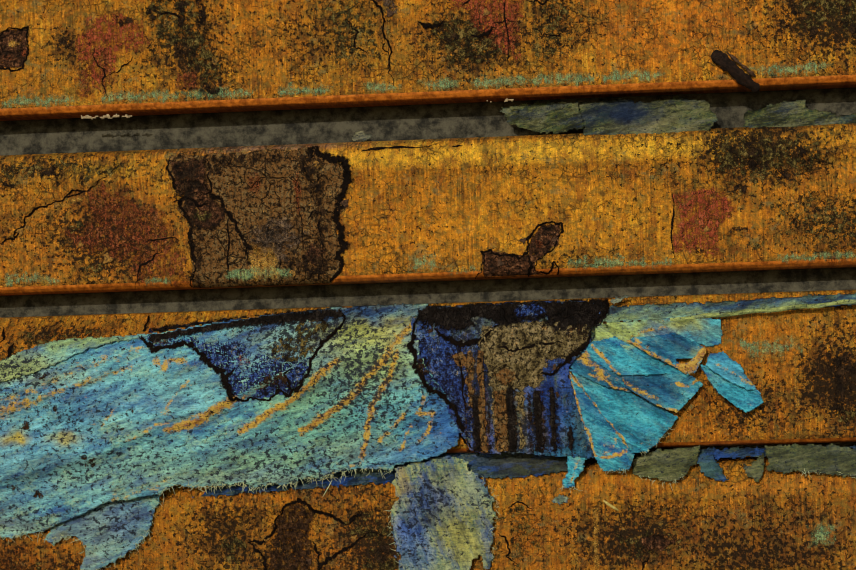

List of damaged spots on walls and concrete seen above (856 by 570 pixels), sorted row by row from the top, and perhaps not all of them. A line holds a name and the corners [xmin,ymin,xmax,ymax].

spalling [0,26,29,72]
crack [309,0,398,86]
corrosion [451,0,523,62]
crack [0,164,117,246]
peeling [166,146,354,288]
peeling [475,221,564,279]
corrosion [670,187,767,259]
peeling [138,308,346,402]
peeling [406,316,481,449]
peeling [221,497,383,570]